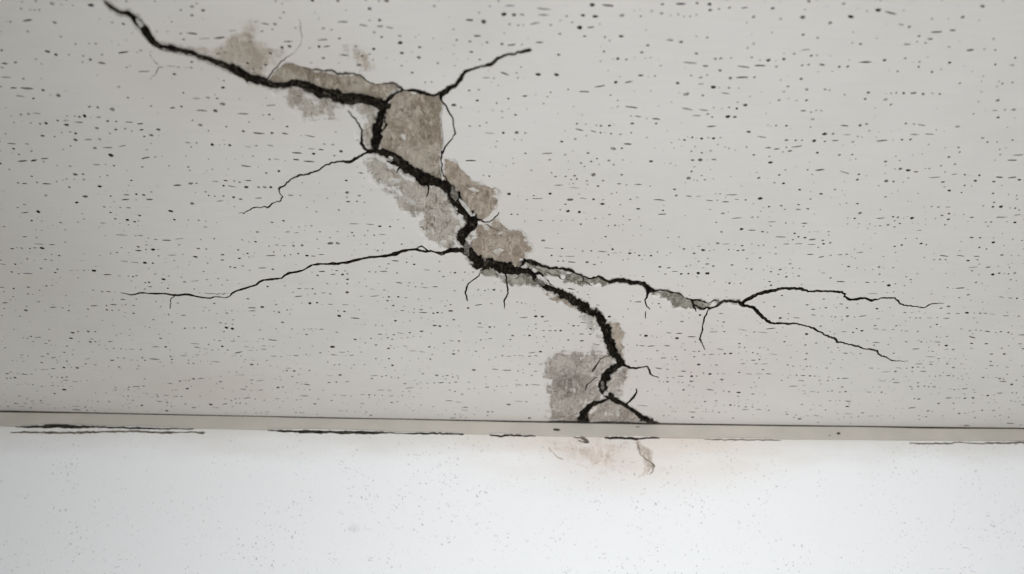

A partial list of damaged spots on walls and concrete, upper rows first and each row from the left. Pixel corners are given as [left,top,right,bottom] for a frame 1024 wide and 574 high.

spalling [267,62,610,314]
crack [104,2,943,422]
spalling [536,319,650,431]
spalling [651,287,741,313]